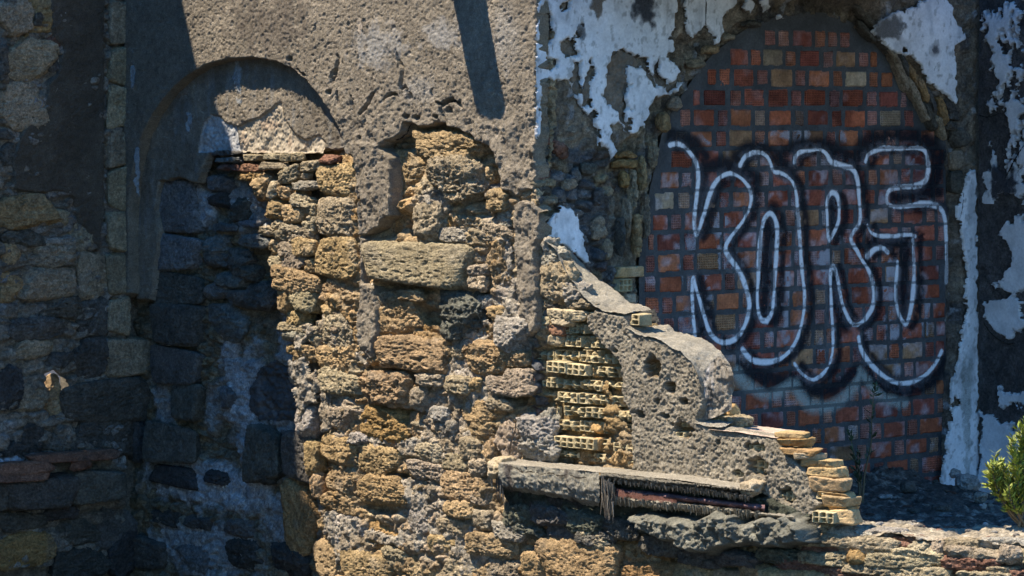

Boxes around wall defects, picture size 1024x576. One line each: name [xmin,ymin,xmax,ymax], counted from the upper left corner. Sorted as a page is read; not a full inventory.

spalling [198,102,326,154]
peeling [553,30,591,107]
peeling [603,50,678,130]
flaking render [978,0,1024,474]
peeling [249,360,297,423]
corrosion [600,488,765,512]